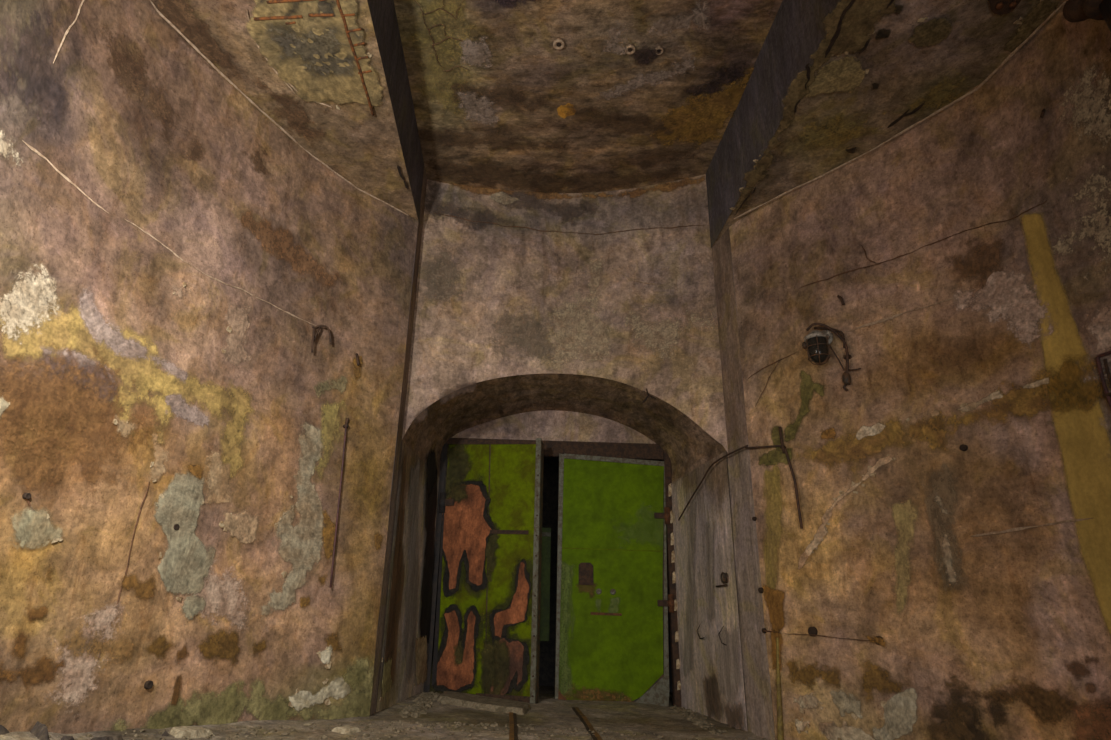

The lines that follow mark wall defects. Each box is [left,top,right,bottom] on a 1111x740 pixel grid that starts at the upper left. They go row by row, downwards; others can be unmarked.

leakage [408,0,754,229]
crack [801,201,1047,288]
leakage [949,239,1053,344]
efflorescence [1052,59,1111,272]
leakage [806,306,1111,589]
leakage [924,675,1076,740]